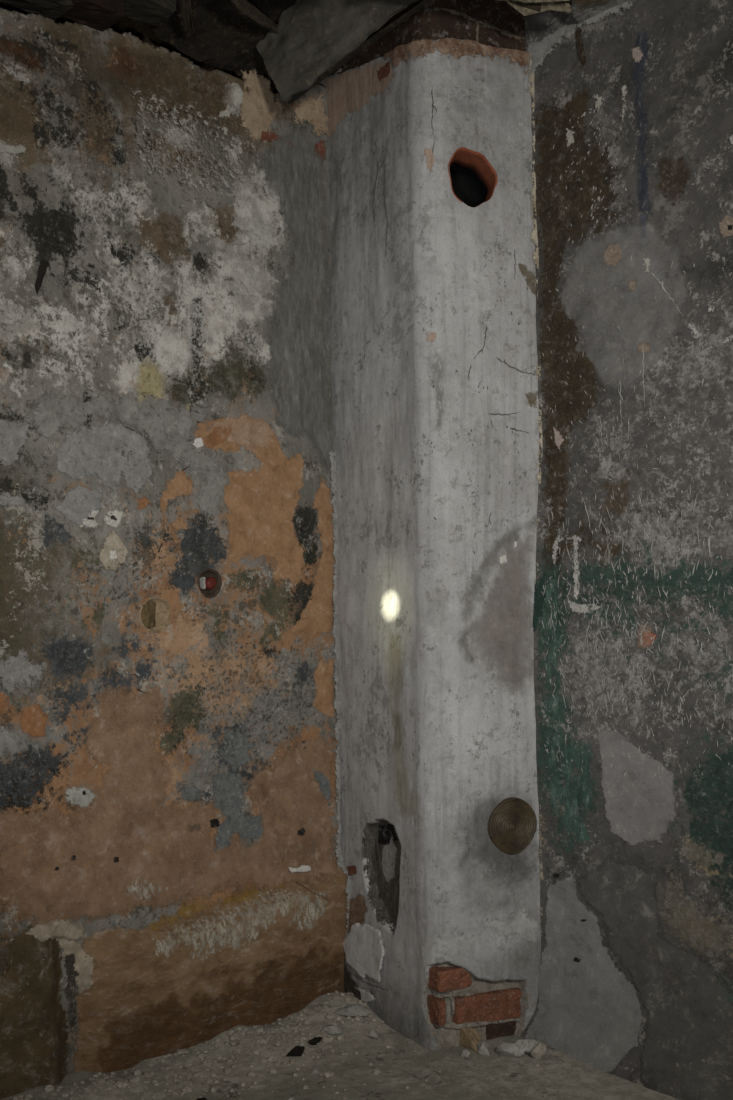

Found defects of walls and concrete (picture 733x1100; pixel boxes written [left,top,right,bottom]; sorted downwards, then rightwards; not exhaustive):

leakage [0,169,9,198]
leakage [24,80,255,288]
flaking render [218,0,529,164]
leakage [633,31,687,220]
leakage [111,244,163,358]
leakage [171,297,267,405]
leakage [519,97,622,566]
leakage [470,530,529,690]
flaking render [0,391,401,1033]
peeling [533,566,733,855]
peeling [684,749,733,911]
spalling [422,962,531,1052]